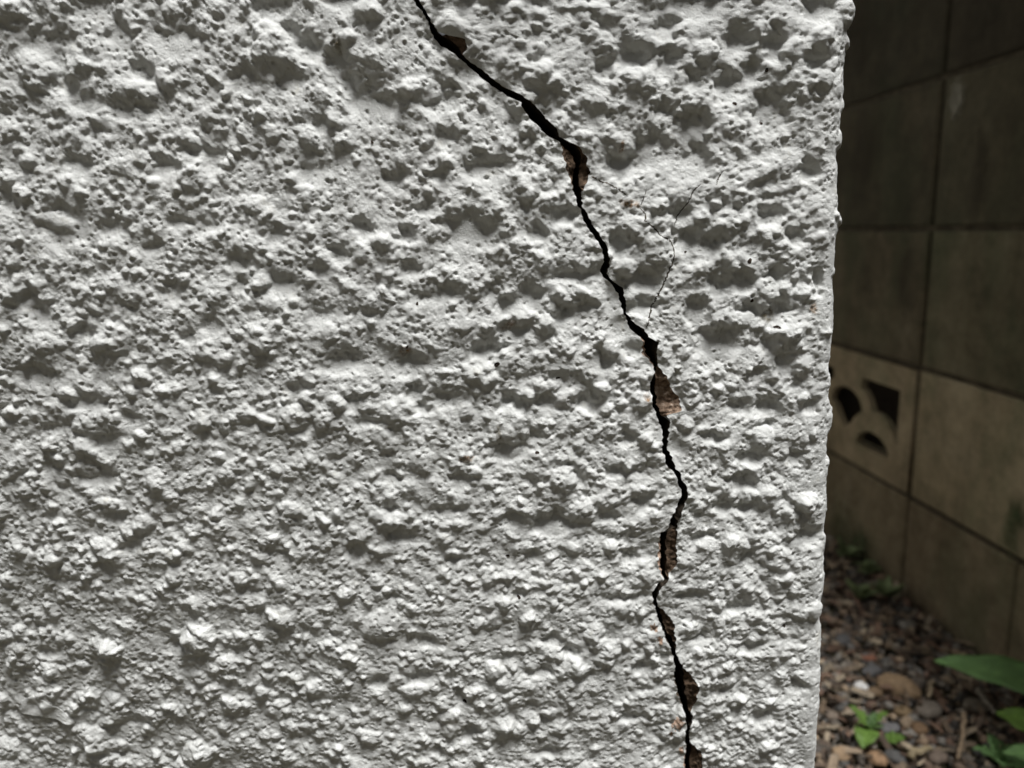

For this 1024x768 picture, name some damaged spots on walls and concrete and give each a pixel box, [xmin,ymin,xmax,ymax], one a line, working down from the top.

crack [414,0,724,768]